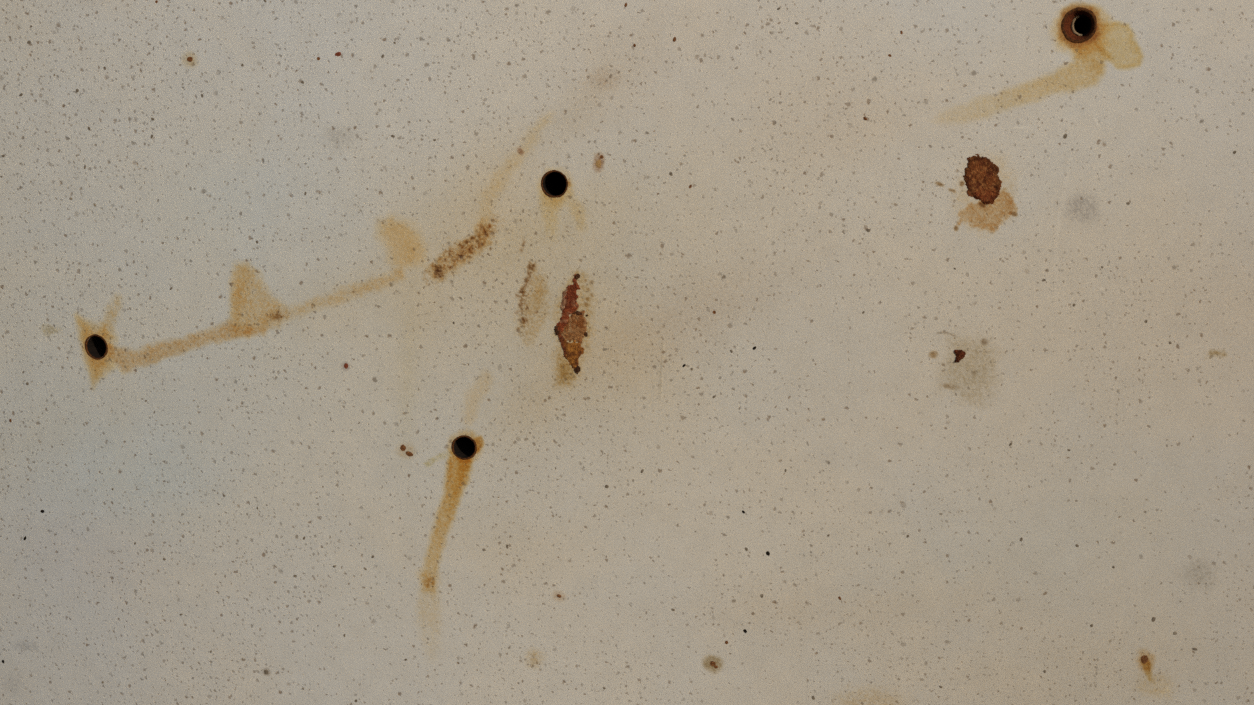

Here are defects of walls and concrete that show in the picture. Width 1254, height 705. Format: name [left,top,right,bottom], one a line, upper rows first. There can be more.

corrosion [928,0,1147,128]
corrosion [72,107,602,394]
corrosion [934,146,1025,243]
corrosion [393,427,486,666]